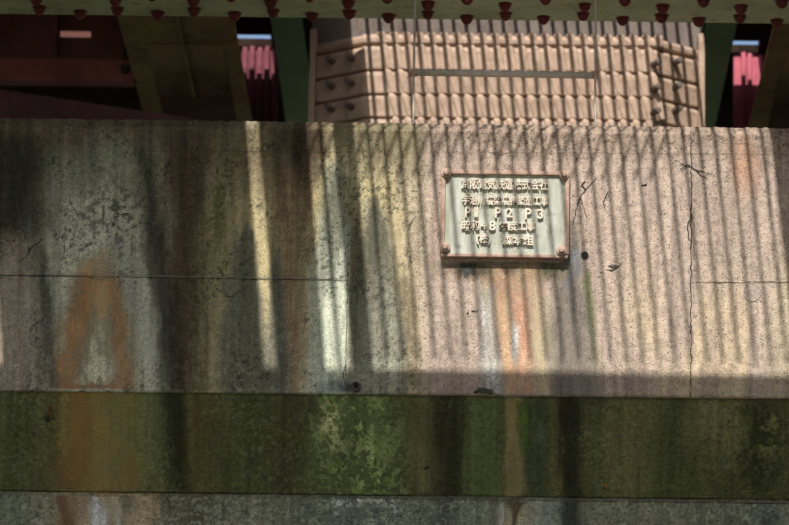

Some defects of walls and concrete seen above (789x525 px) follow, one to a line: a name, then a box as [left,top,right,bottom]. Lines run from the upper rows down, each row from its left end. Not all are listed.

rust [57,254,127,388]
damp [356,195,386,264]
crack [427,129,788,397]